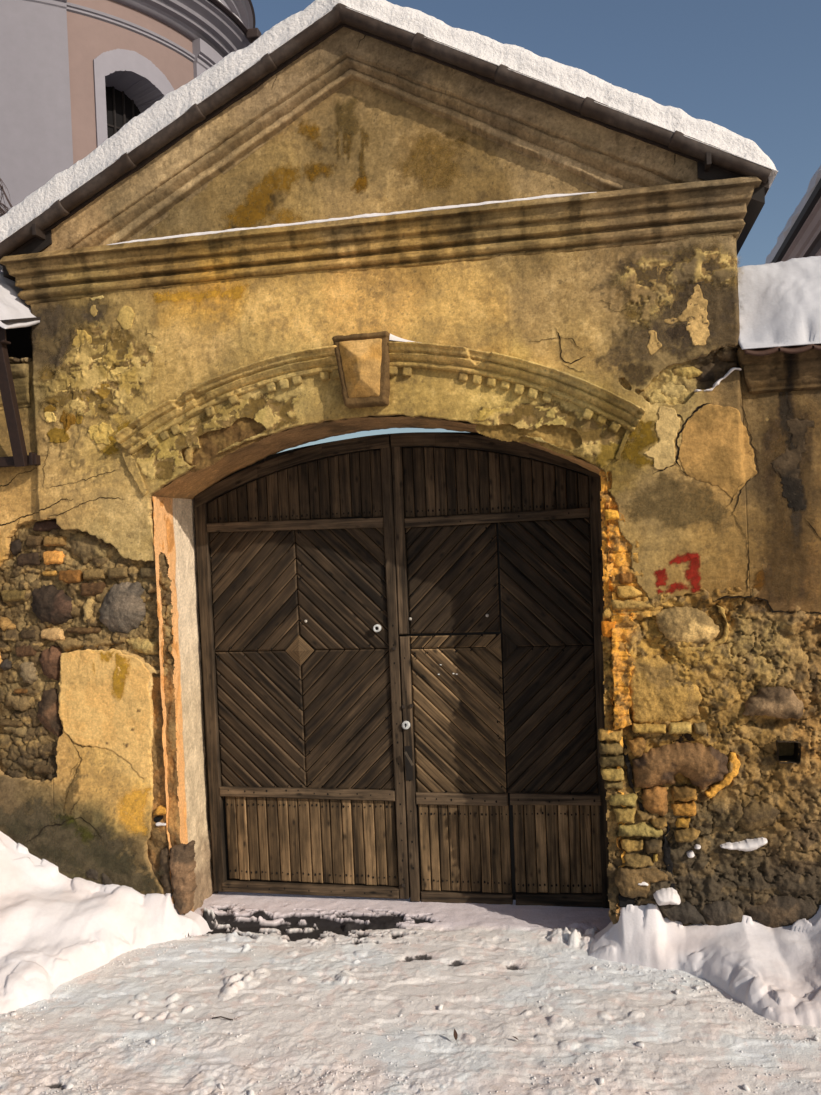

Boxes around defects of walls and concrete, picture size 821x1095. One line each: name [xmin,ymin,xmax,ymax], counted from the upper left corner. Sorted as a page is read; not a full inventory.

crack [0,449,120,528]
peeling [38,295,157,445]
peeling [132,393,300,480]
crack [538,329,585,372]
peeling [618,246,741,470]
crack [652,403,710,476]
crack [713,406,821,614]
water stain [756,391,813,603]
crack [25,734,103,843]
flaking render [0,519,197,915]
flaking render [474,401,821,928]